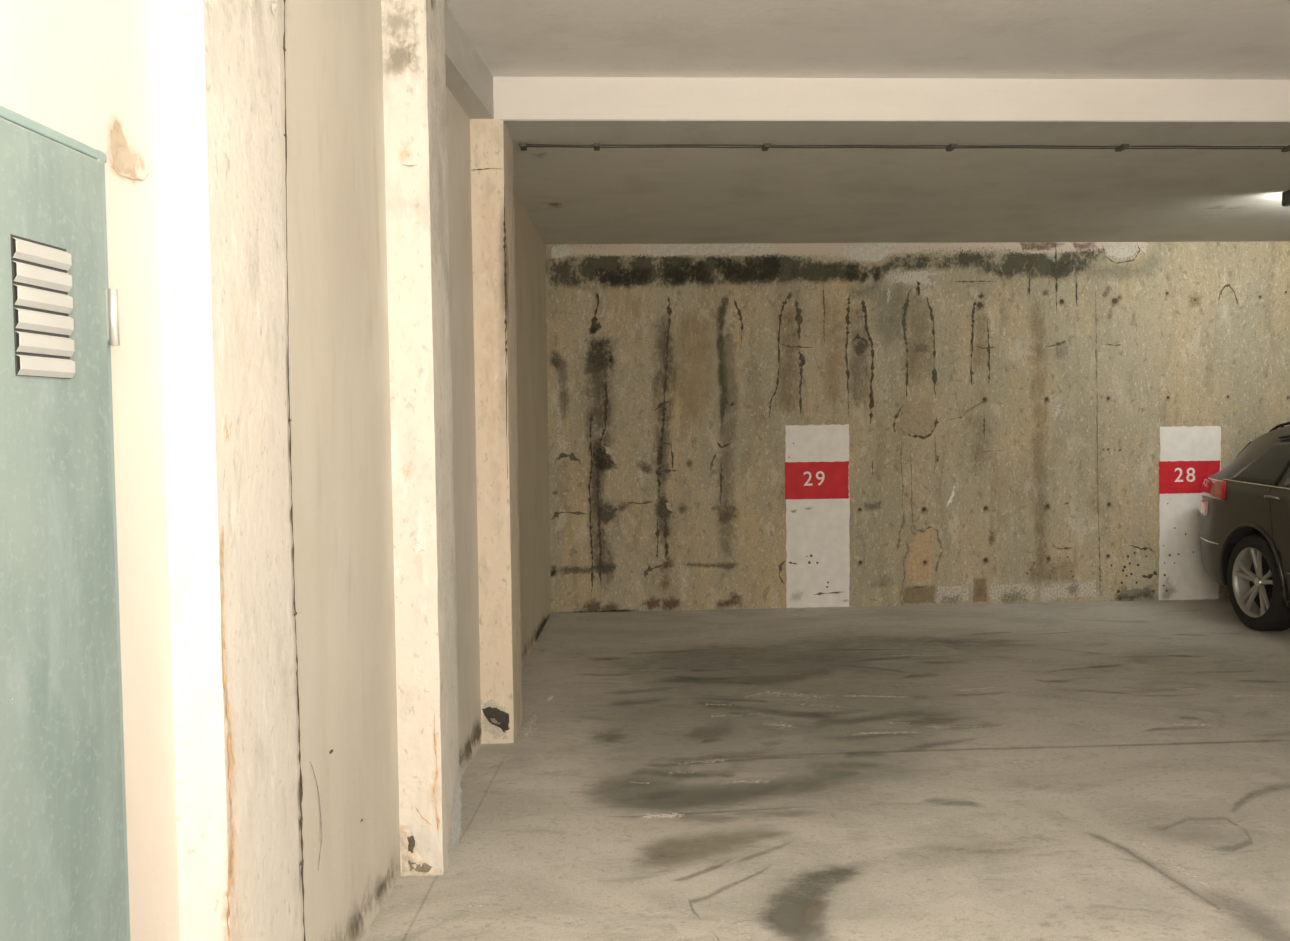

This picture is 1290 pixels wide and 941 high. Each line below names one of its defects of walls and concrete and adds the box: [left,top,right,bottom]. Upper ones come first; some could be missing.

damp [550,242,1140,303]
damp [552,354,615,470]
damp [551,499,685,523]
spalling [896,514,943,597]
damp [551,565,615,576]
damp [644,559,672,578]
damp [904,586,934,603]
damp [974,579,986,602]